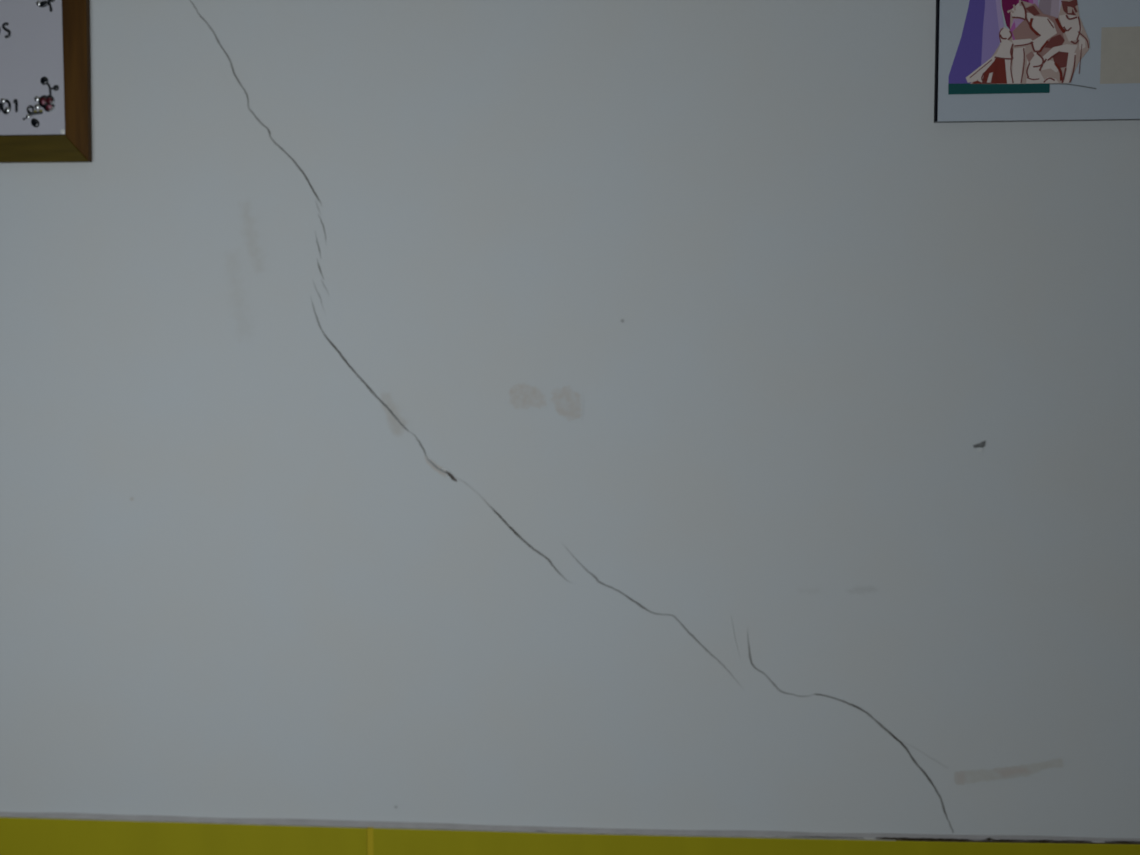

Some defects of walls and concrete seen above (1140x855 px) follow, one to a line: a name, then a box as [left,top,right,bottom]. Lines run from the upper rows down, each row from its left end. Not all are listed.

crack [189,0,574,584]
crack [560,542,1140,843]